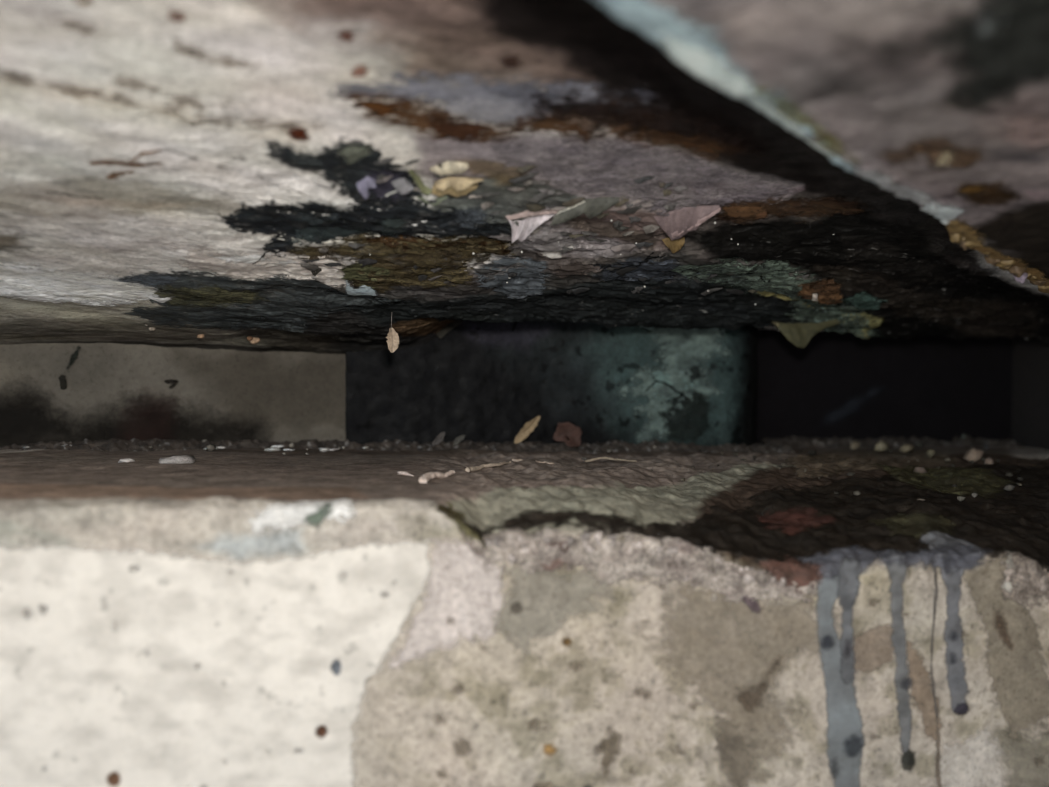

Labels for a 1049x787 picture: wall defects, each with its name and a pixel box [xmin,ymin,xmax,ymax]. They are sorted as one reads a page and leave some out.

corrosion [339,85,774,161]
peeling [301,247,342,276]
peeling [356,134,796,300]
water stain [0,390,265,447]
peeling [0,453,1049,787]
water stain [660,531,1049,787]